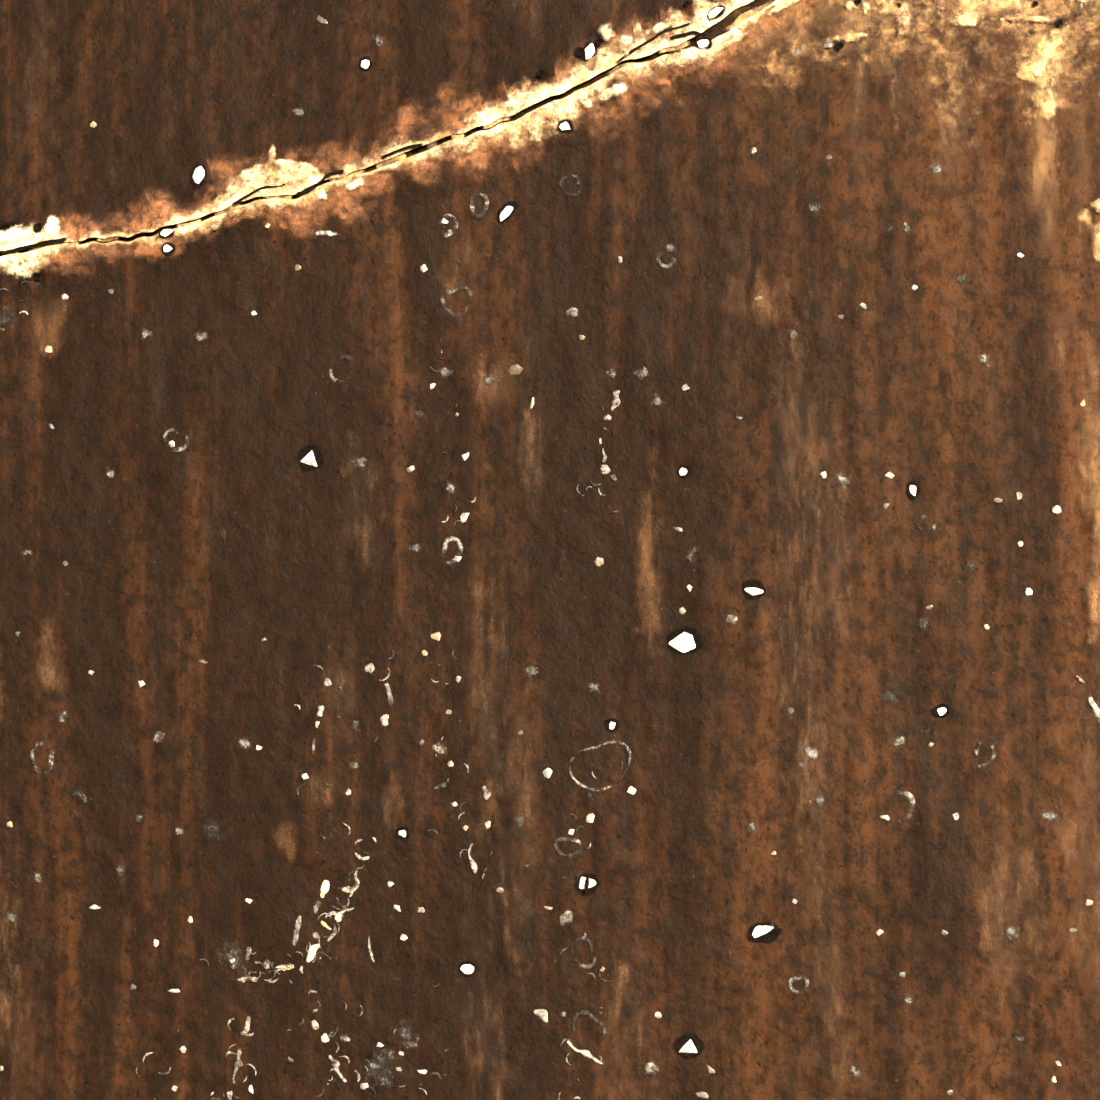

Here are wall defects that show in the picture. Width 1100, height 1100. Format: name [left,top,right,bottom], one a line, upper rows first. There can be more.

peeling [581,42,597,62]
peeling [694,37,713,50]
peeling [707,5,726,21]
spalling [751,5,811,75]
spalling [823,0,1100,120]
crack [0,0,820,281]